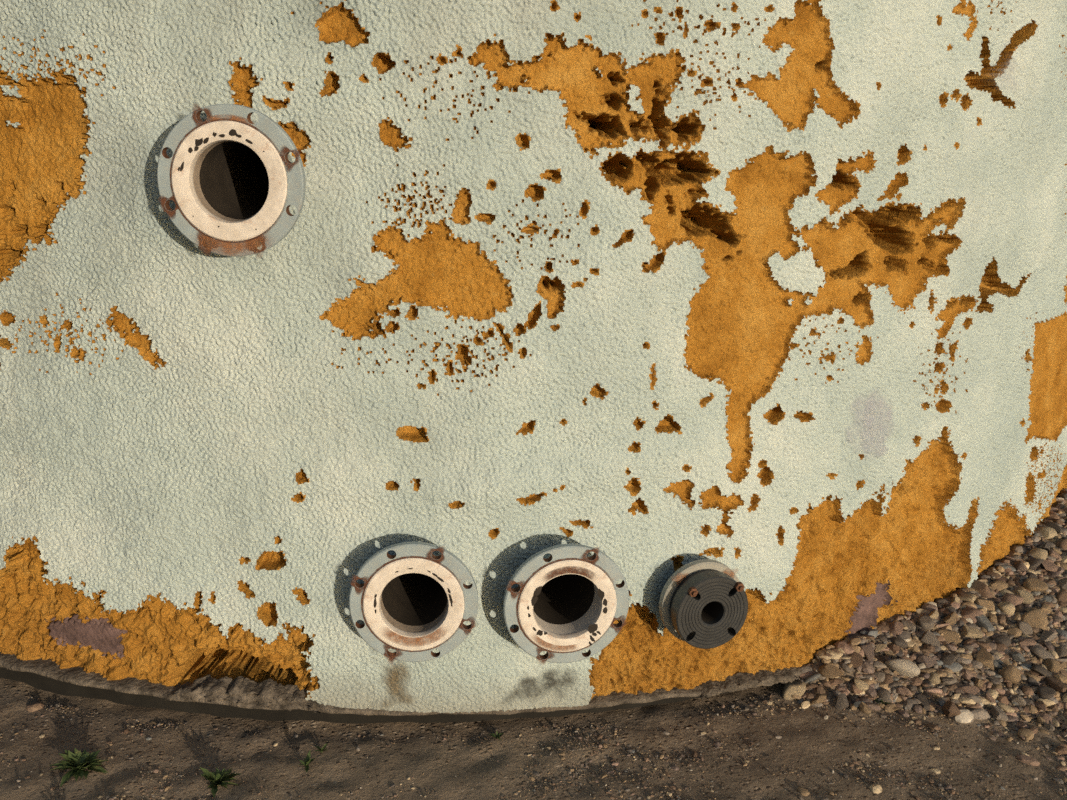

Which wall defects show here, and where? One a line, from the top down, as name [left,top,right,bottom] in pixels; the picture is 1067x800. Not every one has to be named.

peeling [0,29,116,282]
spalling [178,129,253,171]
peeling [228,57,311,167]
peeling [0,292,167,375]
peeling [315,0,1038,559]
spalling [291,469,310,503]
peeling [588,267,1067,699]
peeling [0,535,320,699]
spalling [527,586,547,636]